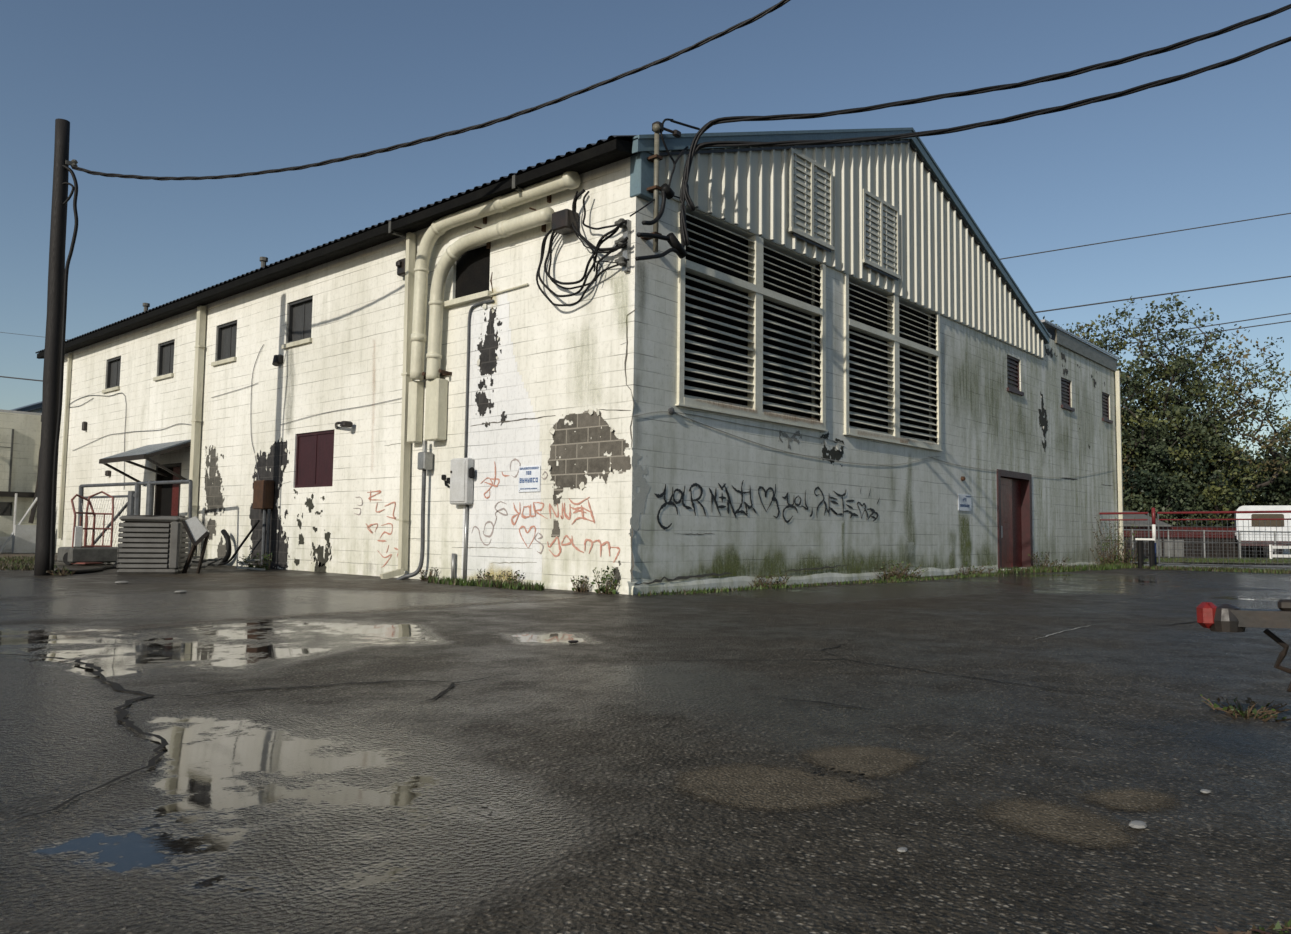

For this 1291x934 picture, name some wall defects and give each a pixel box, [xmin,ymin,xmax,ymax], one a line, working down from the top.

peeling [204,445,226,558]
peeling [249,437,332,572]
peeling [475,304,507,428]
spalling [548,408,650,537]
peeling [820,431,844,467]
peeling [1039,391,1049,449]